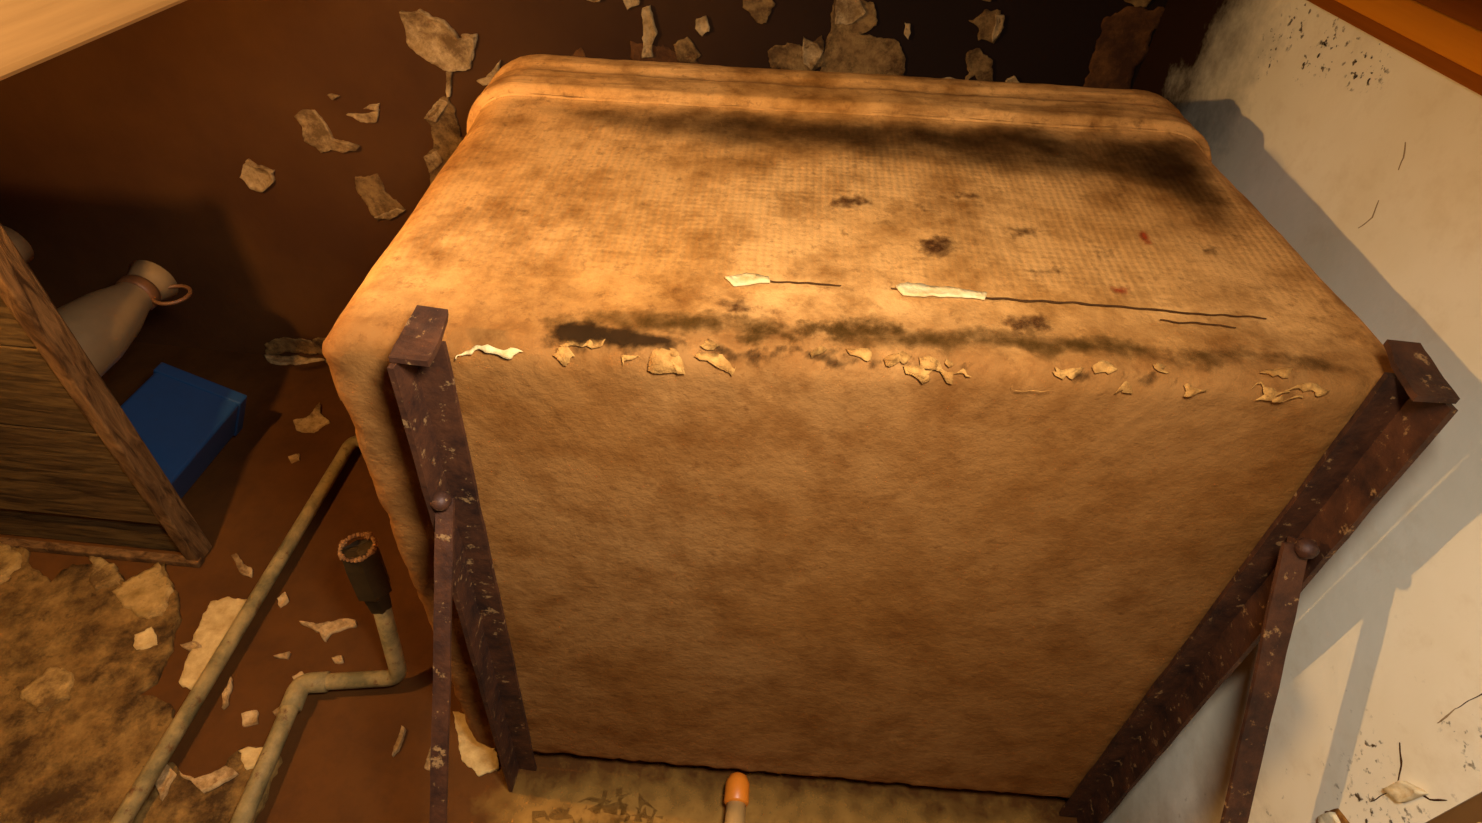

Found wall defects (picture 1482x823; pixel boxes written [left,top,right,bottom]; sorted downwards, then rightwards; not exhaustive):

peeling [623,0,710,64]
peeling [768,0,911,76]
peeling [945,0,1020,83]
peeling [1083,0,1165,89]
peeling [399,9,501,185]
peeling [239,158,275,192]
peeling [299,618,357,664]
spalling [0,542,263,823]
peeling [222,677,280,727]
crack [1437,694,1482,723]
peeling [453,711,499,777]
crack [1370,742,1447,803]